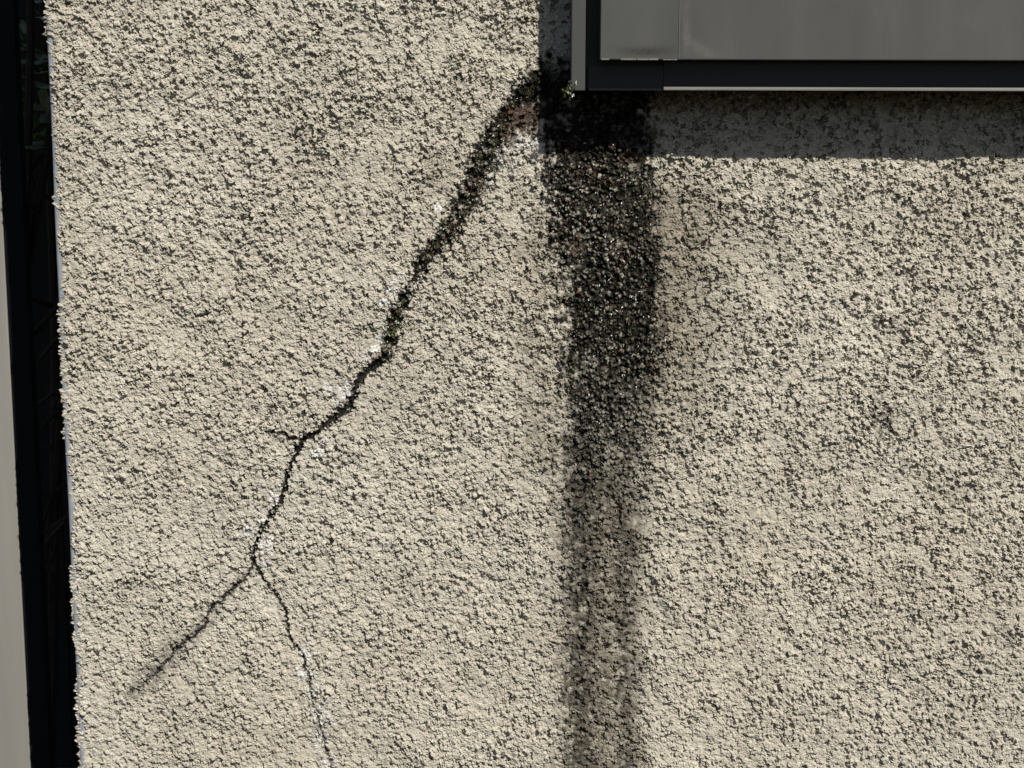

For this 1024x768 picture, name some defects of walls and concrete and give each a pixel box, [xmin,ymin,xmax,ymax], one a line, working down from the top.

crack [153,76,549,766]
leakage [514,51,1024,766]